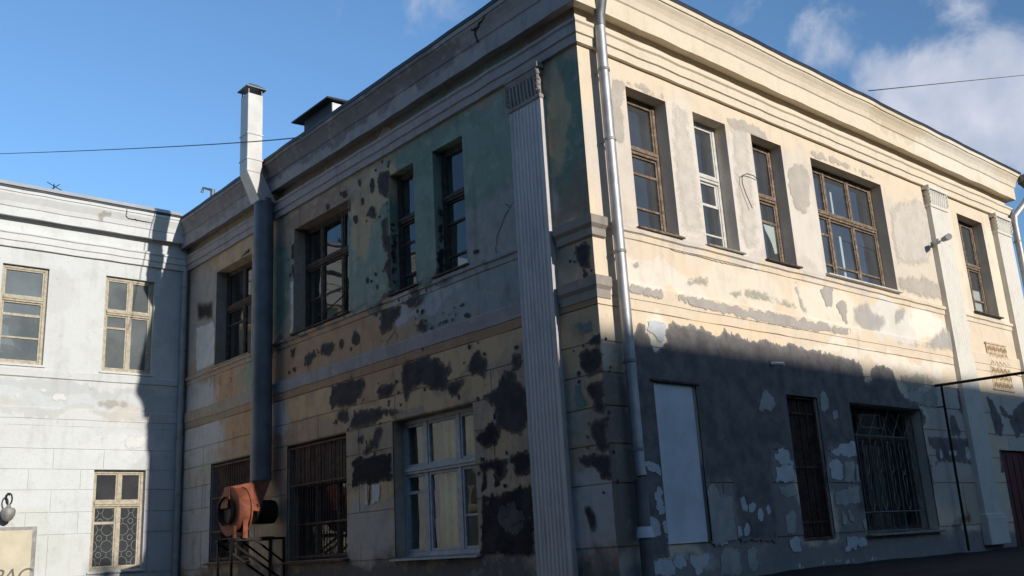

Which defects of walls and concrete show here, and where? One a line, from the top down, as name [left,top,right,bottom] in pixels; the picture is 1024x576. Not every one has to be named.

crack [470,14,485,59]
flaking render [340,160,447,342]
flaking render [329,342,530,488]
flaking render [573,333,620,495]
peeling [759,385,776,413]
peeling [642,461,771,576]
peeling [775,447,804,569]
peeling [823,441,877,565]